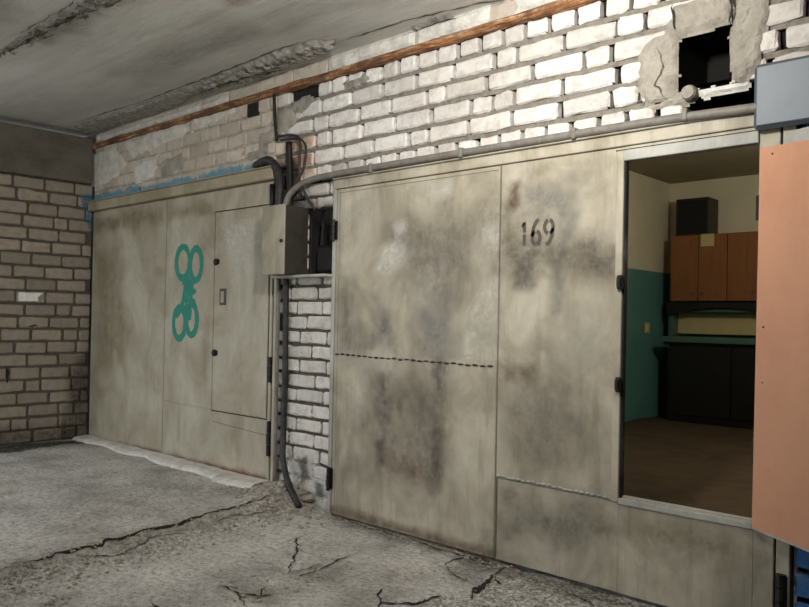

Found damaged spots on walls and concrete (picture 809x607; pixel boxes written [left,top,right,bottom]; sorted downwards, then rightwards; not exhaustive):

peeling [515,0,557,14]
flaking render [66,0,500,187]
crack [287,536,350,578]
crack [336,517,509,607]